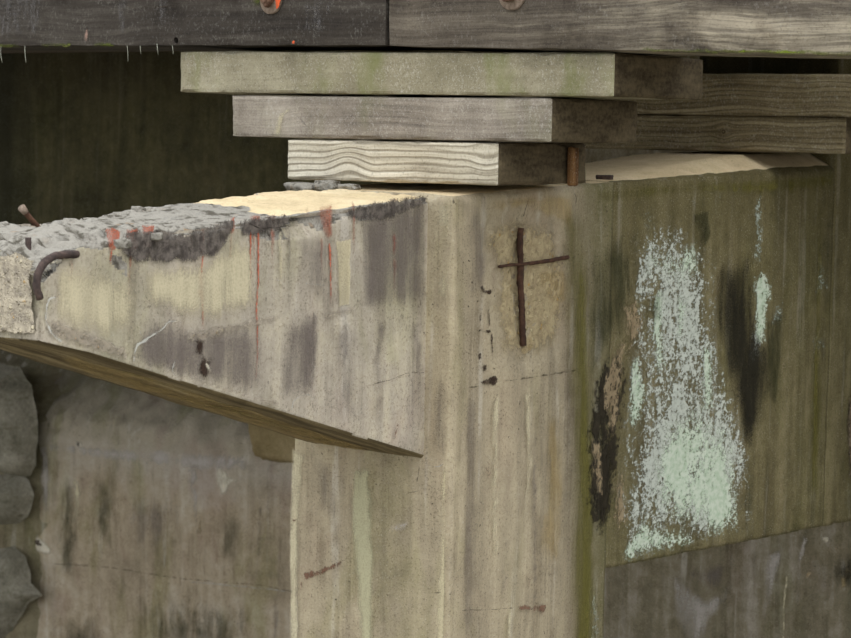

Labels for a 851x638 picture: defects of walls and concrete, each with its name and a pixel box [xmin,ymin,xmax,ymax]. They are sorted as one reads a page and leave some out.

spalling [0,250,80,334]
rust [250,232,260,360]
rust [321,206,332,295]
peeling [586,301,643,535]
leakage [623,214,783,561]